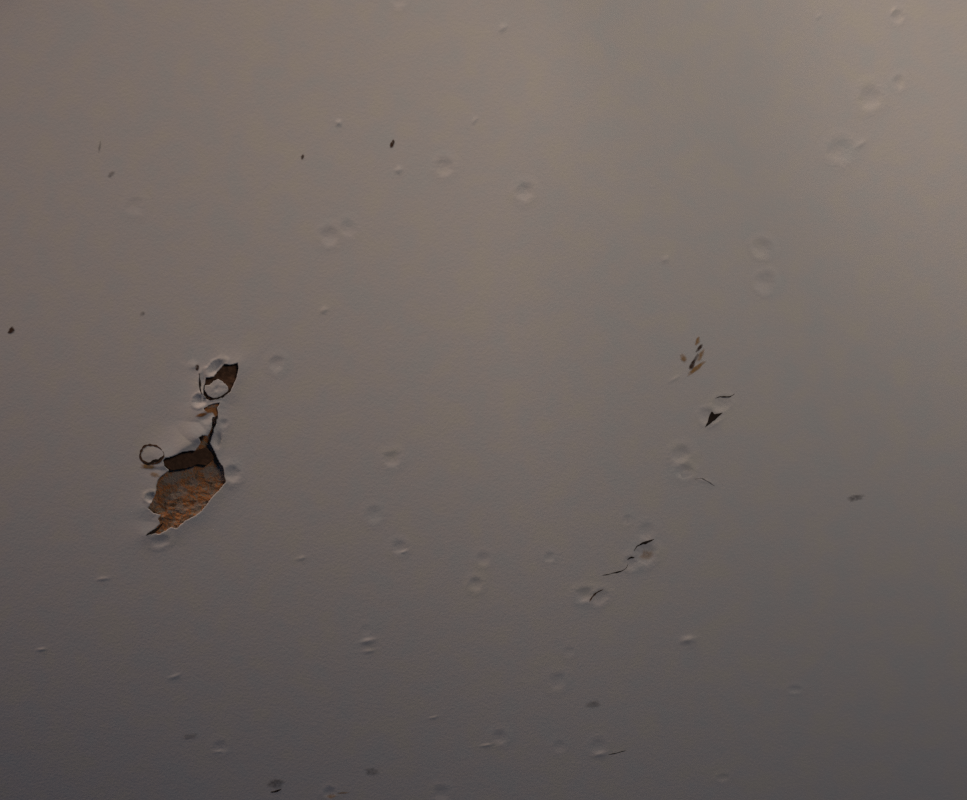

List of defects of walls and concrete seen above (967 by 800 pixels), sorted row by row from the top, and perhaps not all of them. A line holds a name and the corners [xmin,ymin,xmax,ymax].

peeling [112,328,272,568]
peeling [682,337,703,374]